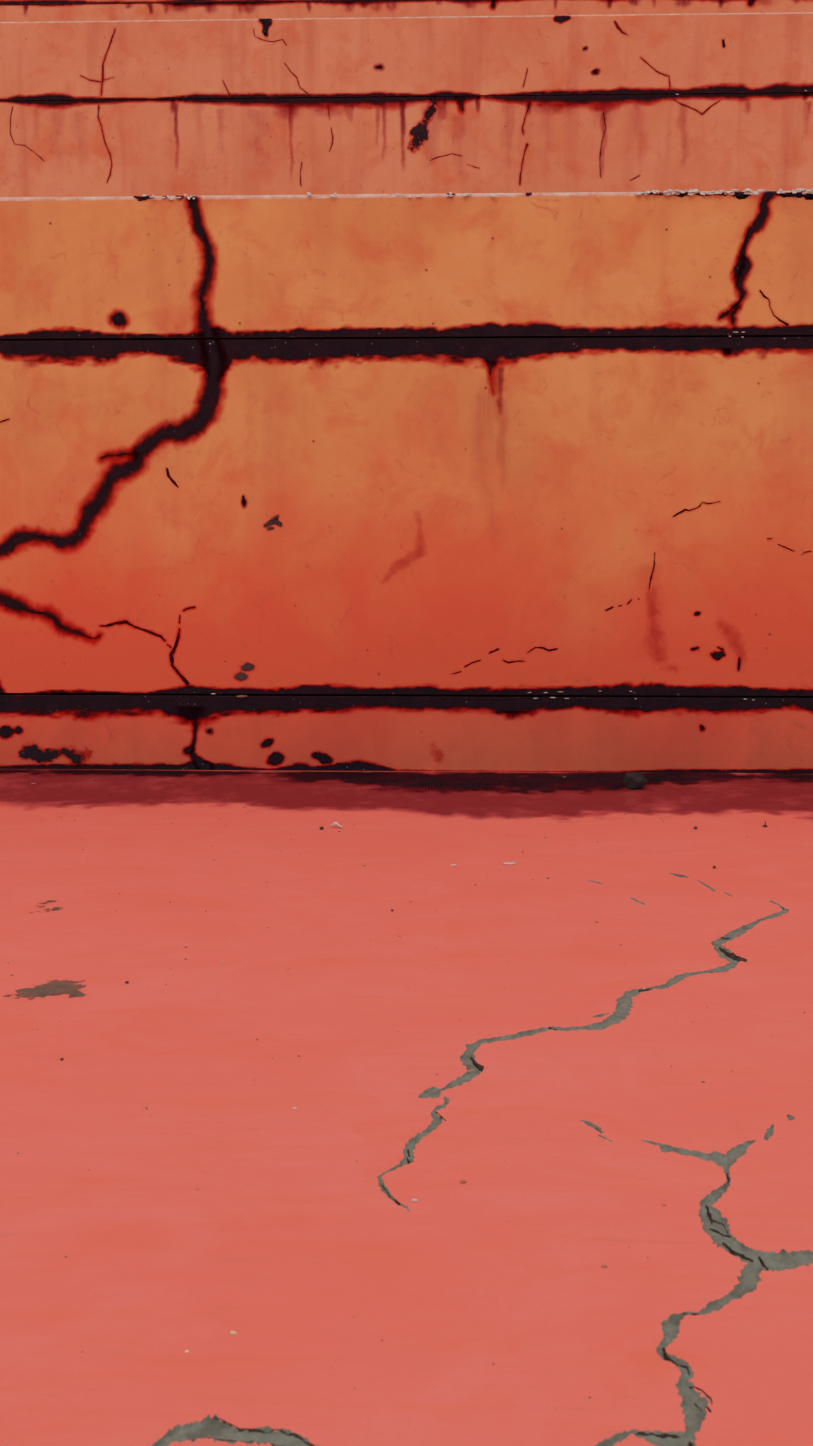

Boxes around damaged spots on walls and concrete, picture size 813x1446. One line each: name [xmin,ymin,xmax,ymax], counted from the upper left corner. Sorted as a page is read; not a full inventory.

leakage [0,0,522,11]
leakage [0,83,813,151]
crack [718,191,789,326]
leakage [0,322,813,390]
crack [0,196,225,686]
leakage [0,683,813,723]
crack [183,720,213,770]
crack [377,873,789,1212]
crack [580,1114,813,1446]
crack [151,1414,318,1446]